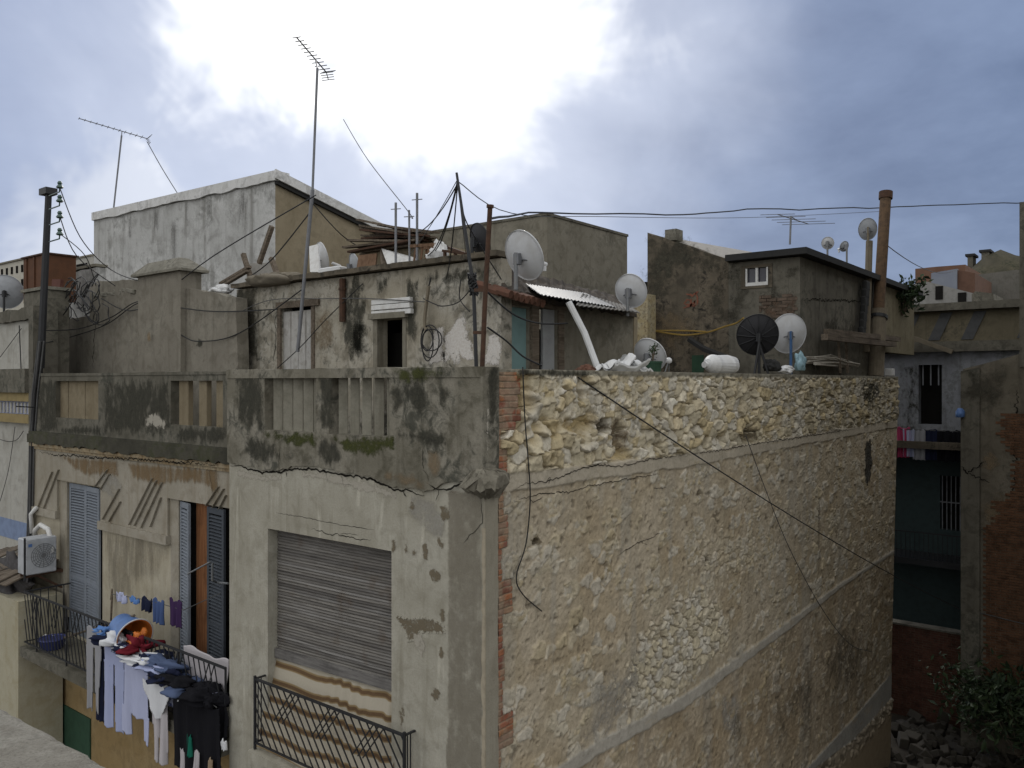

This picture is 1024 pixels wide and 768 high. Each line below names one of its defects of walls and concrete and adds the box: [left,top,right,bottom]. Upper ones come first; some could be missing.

water stain [301,275,366,360]
peeling [429,316,502,365]
mould [39,380,226,443]
mould [236,368,278,459]
water stain [319,378,340,464]
crack [40,447,461,501]
crack [512,429,855,503]
crack [959,391,1019,532]
spalling [392,538,443,581]
spalling [396,609,446,657]